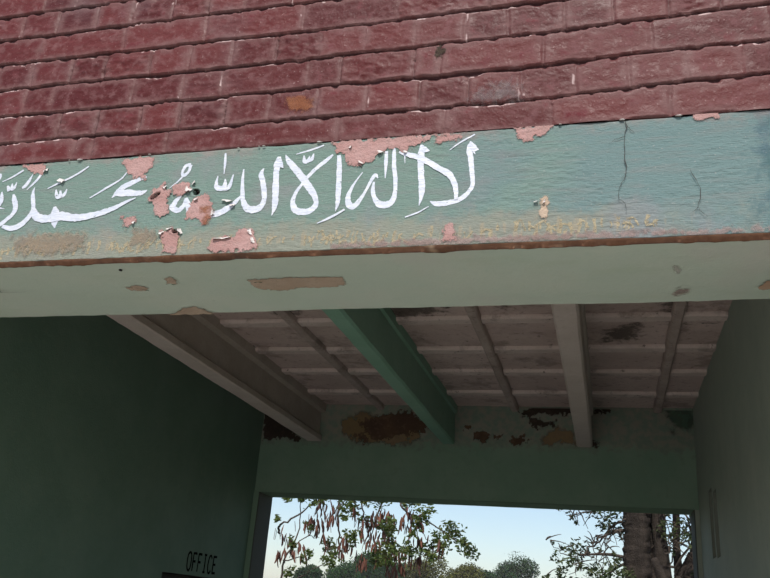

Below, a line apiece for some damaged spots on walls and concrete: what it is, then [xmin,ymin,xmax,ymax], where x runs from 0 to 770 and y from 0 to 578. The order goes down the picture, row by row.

peeling [317,132,466,166]
peeling [23,163,48,175]
peeling [121,154,154,181]
crack [613,121,635,210]
peeling [148,180,215,225]
peeling [534,196,550,221]
spalling [0,215,770,268]
peeling [247,277,346,291]
damp [391,307,449,317]